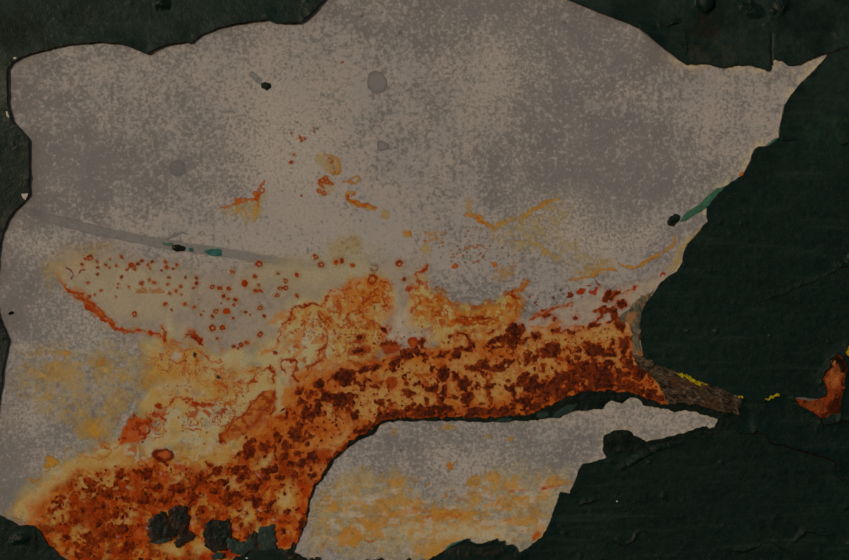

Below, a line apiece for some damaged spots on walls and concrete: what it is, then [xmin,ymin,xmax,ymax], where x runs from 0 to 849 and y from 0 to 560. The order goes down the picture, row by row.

corrosion [450,198,562,268]
peeling [667,214,680,226]
peeling [177,284,284,348]
corrosion [7,228,701,560]
peeling [147,397,718,560]